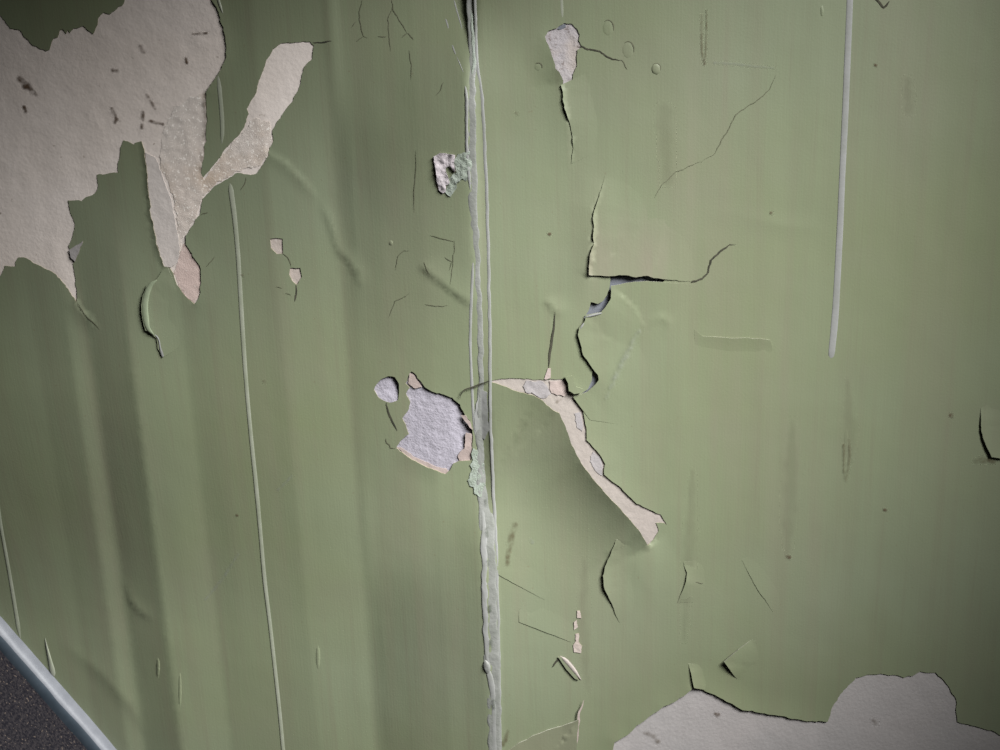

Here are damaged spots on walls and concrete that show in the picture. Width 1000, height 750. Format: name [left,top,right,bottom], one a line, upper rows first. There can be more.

peeling [0,0,314,358]
flaking render [433,151,472,197]
peeling [545,23,598,164]
crack [655,78,775,197]
crack [692,244,736,282]
peeling [492,170,703,545]
flaking render [374,371,473,474]
peeling [613,664,1000,750]